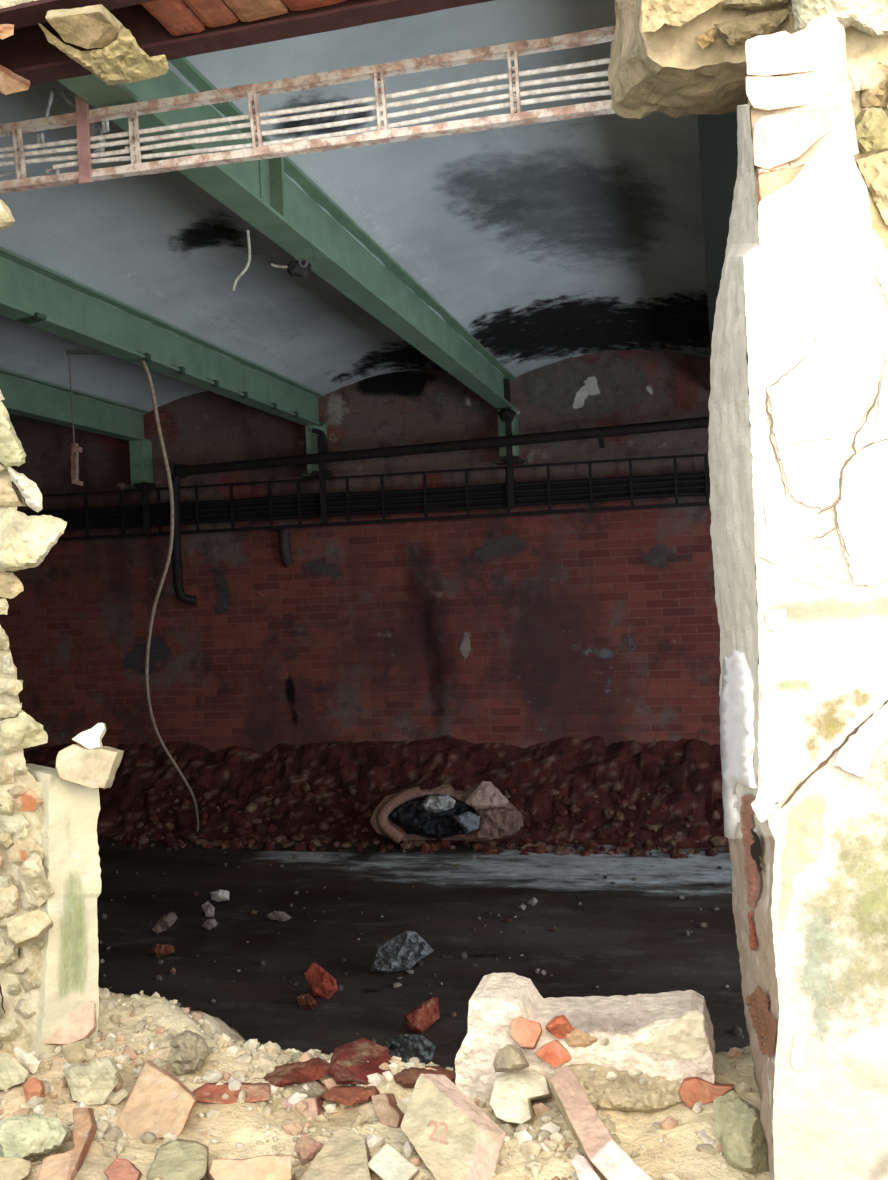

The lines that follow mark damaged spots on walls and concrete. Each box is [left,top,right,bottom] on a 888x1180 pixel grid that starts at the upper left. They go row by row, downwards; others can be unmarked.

leakage [455,167,655,252]
flaking render [749,285,888,588]
crack [749,349,888,583]
crack [781,700,888,809]